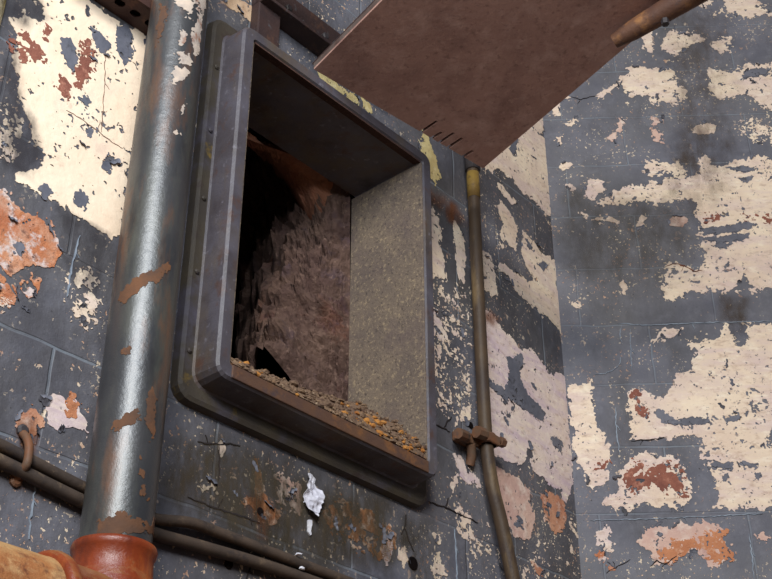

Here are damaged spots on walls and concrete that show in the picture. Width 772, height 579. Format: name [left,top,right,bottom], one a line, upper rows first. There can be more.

spalling [0,188,63,313]
peeling [0,0,147,241]
peeling [418,129,442,186]
peeling [482,96,580,334]
peeling [595,65,688,144]
peeling [563,154,772,302]
peeling [641,25,735,57]
peeling [705,62,772,111]
peeling [734,116,772,146]
peeling [431,207,476,427]
peeling [15,391,89,444]
peeling [447,451,504,579]